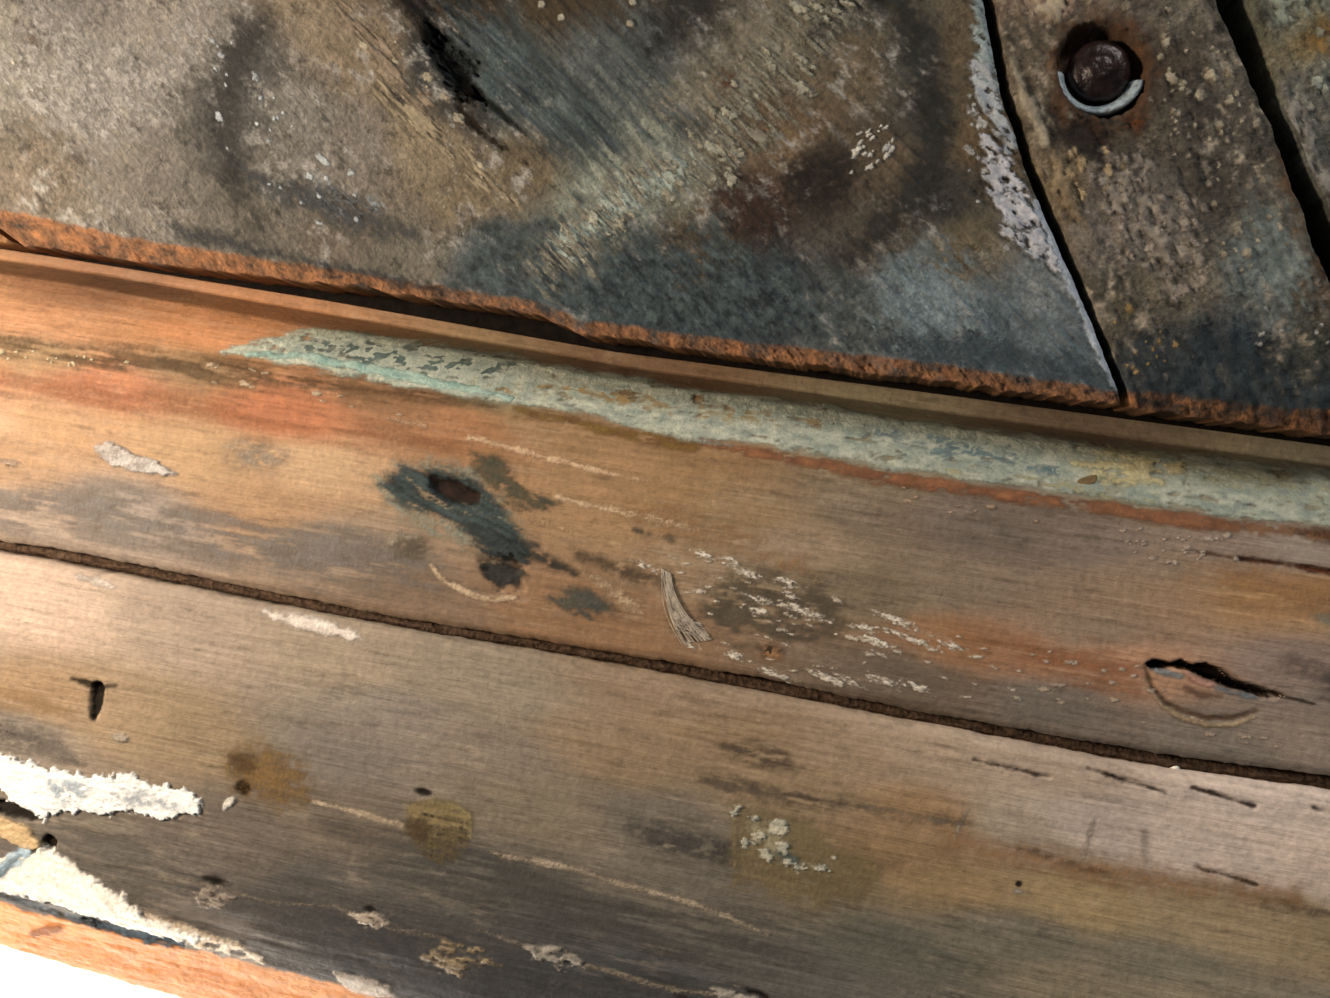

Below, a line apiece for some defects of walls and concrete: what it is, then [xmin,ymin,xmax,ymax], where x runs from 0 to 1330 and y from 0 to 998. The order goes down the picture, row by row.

rust [1047,14,1160,165]
water stain [0,435,843,660]
peeling [671,550,997,692]
crack [1146,659,1315,704]
peeling [0,753,264,965]
peeling [730,805,836,874]
peeling [334,972,394,998]